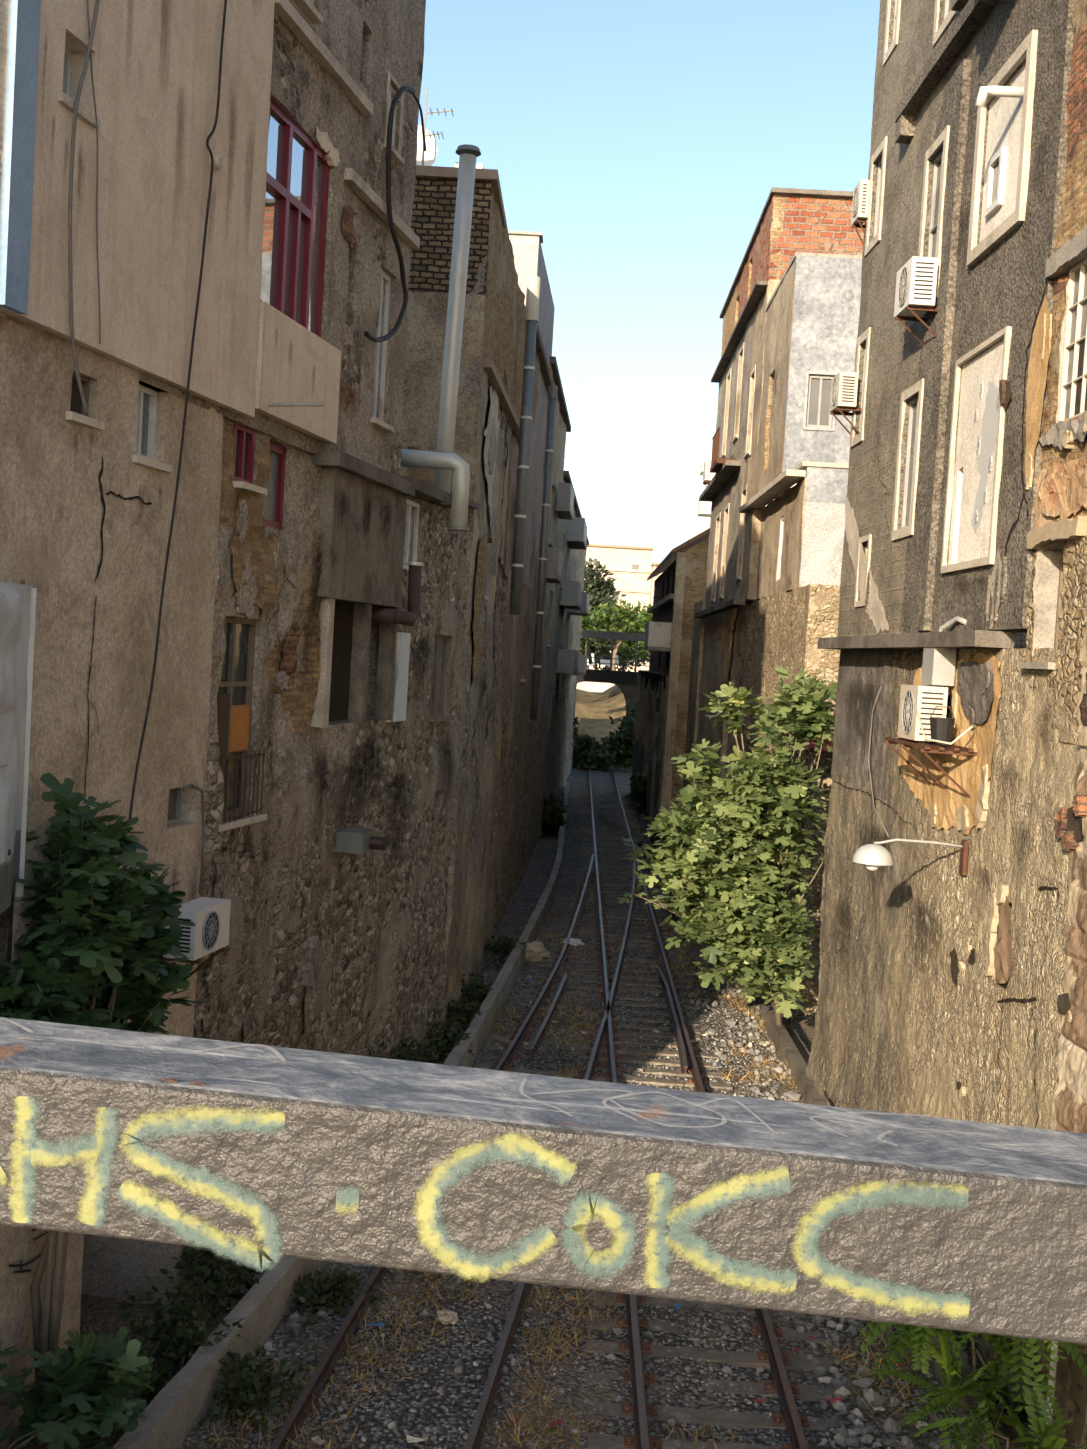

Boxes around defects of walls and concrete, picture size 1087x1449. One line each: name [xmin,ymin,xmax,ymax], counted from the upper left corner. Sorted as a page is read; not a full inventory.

crack [84,456,152,798]
flaking render [984,548,1007,629]
peeling [897,650,1001,835]
spalling [1054,794,1087,852]